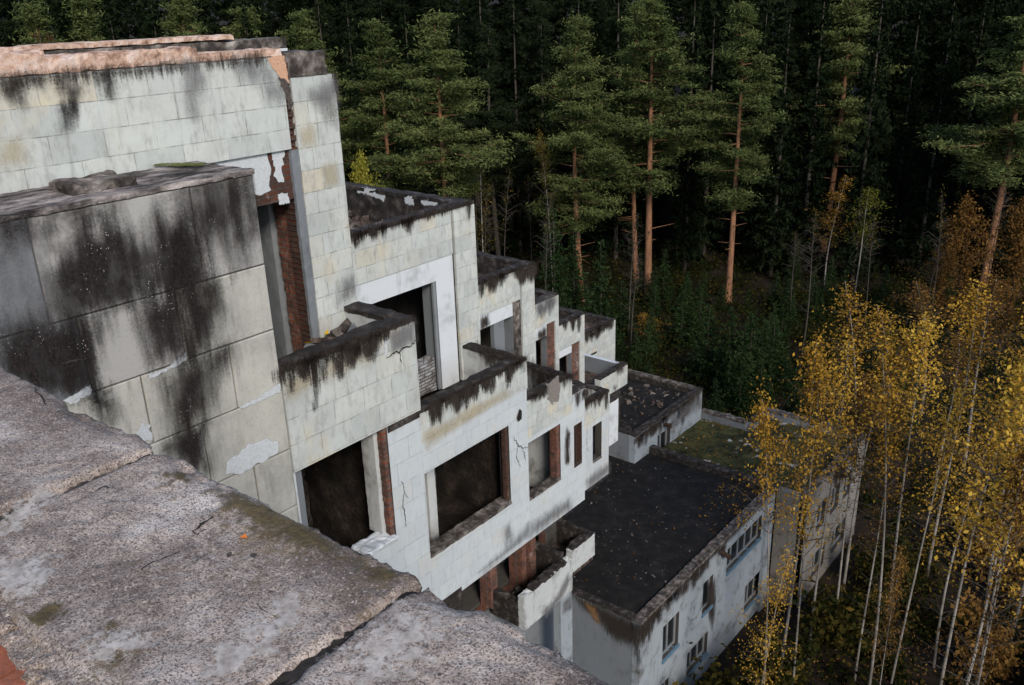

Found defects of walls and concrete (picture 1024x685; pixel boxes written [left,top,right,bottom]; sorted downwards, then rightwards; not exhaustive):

damp [1,76,27,104]
damp [61,81,79,126]
damp [96,69,113,99]
peeling [214,150,290,205]
damp [351,196,480,249]
damp [0,175,256,471]
damp [272,317,415,410]
damp [425,315,616,425]
peeling [63,386,92,405]
peeling [136,422,153,441]
peeling [226,438,279,475]